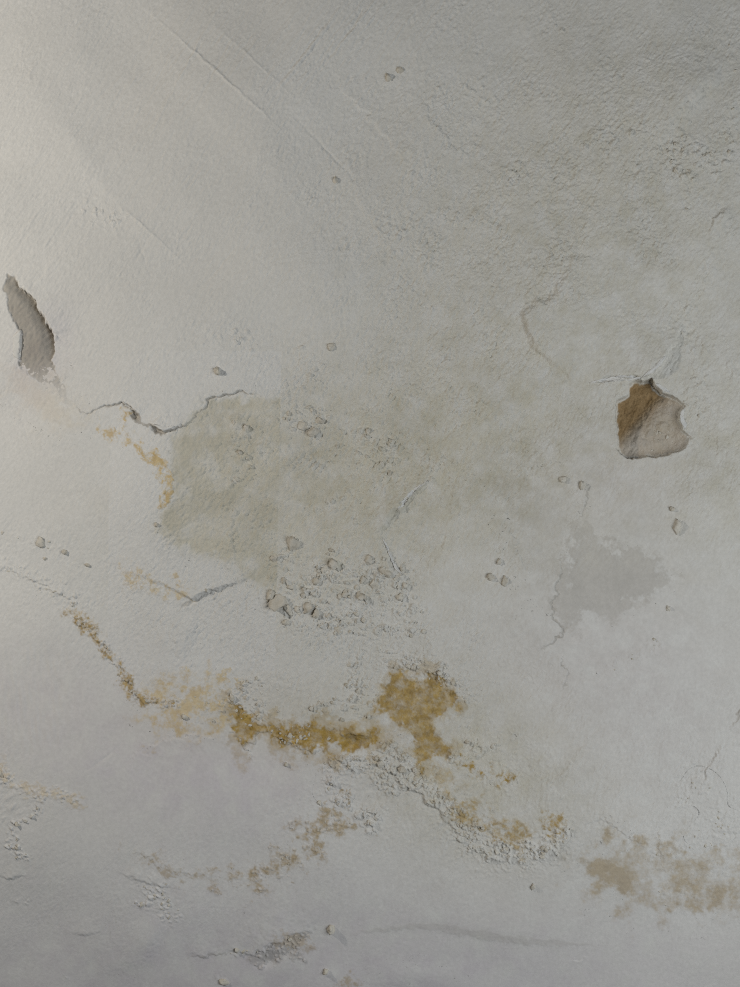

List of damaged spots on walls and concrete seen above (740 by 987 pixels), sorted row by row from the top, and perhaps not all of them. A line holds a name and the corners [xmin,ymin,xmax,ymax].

peeling [0,271,75,408]
crack [77,390,262,437]
spalling [613,376,695,461]
crack [176,577,253,613]
flaking render [153,380,516,774]
crack [540,486,589,692]
rust [58,605,569,862]
flaking render [312,739,573,870]
flaking render [187,928,318,970]